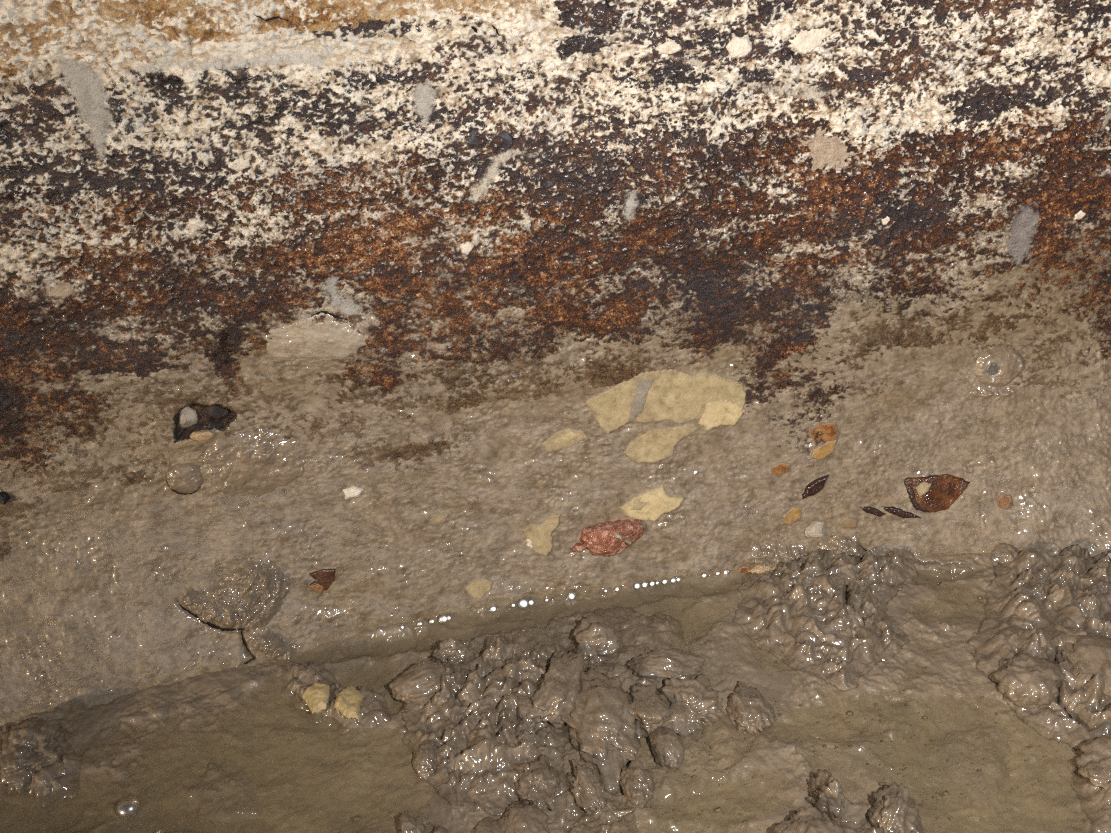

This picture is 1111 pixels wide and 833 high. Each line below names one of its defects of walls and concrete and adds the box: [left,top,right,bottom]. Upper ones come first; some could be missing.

rust [0,98,1111,528]
rust [308,569,335,594]